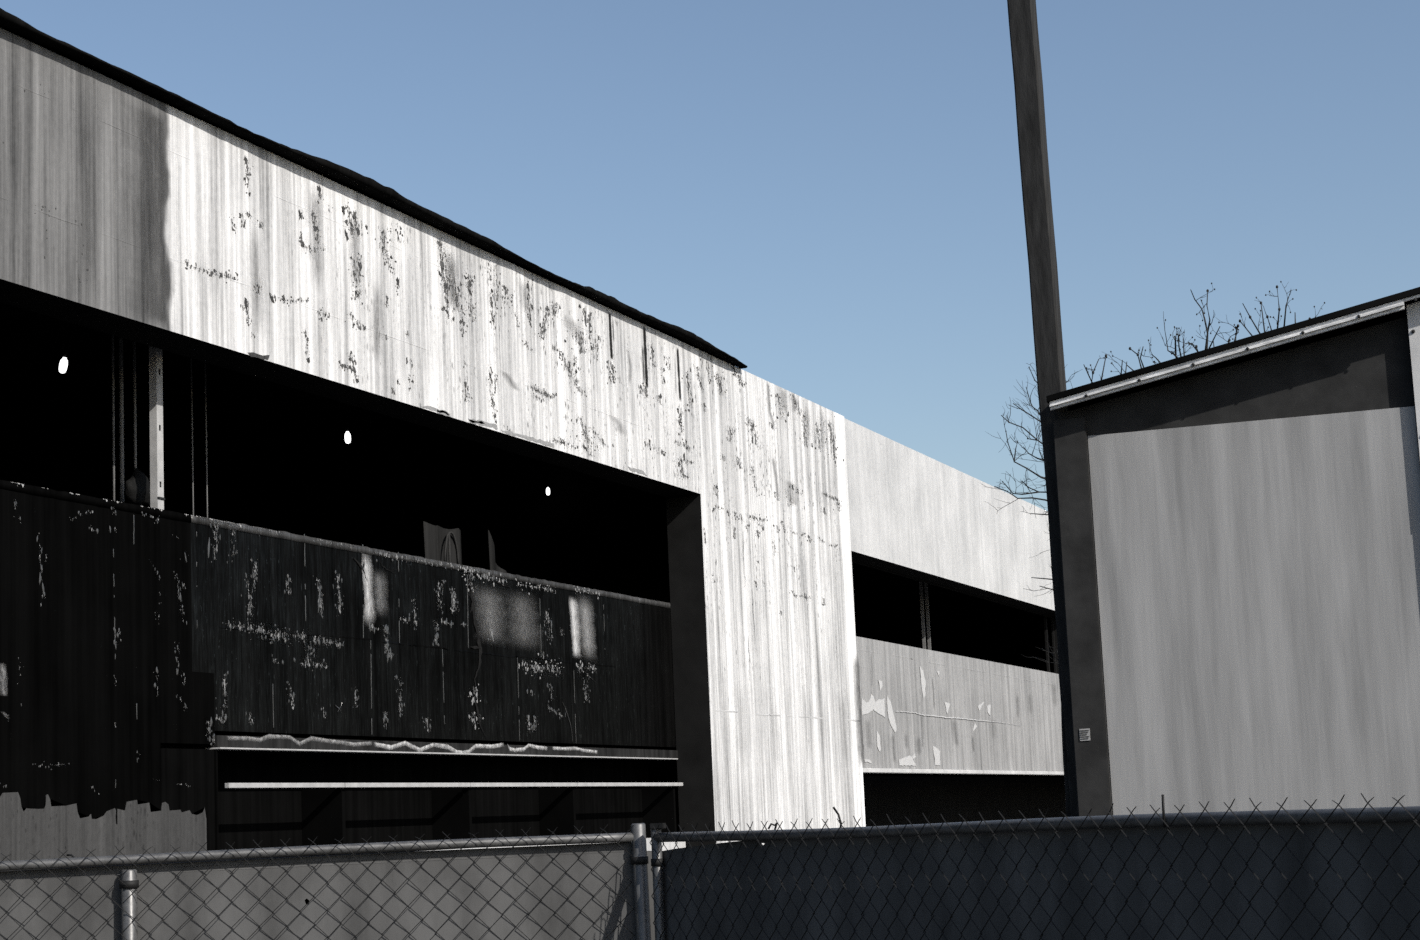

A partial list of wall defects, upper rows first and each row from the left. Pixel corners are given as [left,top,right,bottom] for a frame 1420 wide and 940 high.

water stain [153,120,171,319]
peeling [229,157,263,233]
peeling [240,185,403,360]
peeling [338,351,359,383]
peeling [437,239,616,397]
peeling [462,363,614,456]
peeling [640,344,747,480]
peeling [722,394,844,505]
peeling [712,485,838,563]
peeling [222,560,343,669]
peeling [373,551,556,646]
peeling [862,680,897,763]